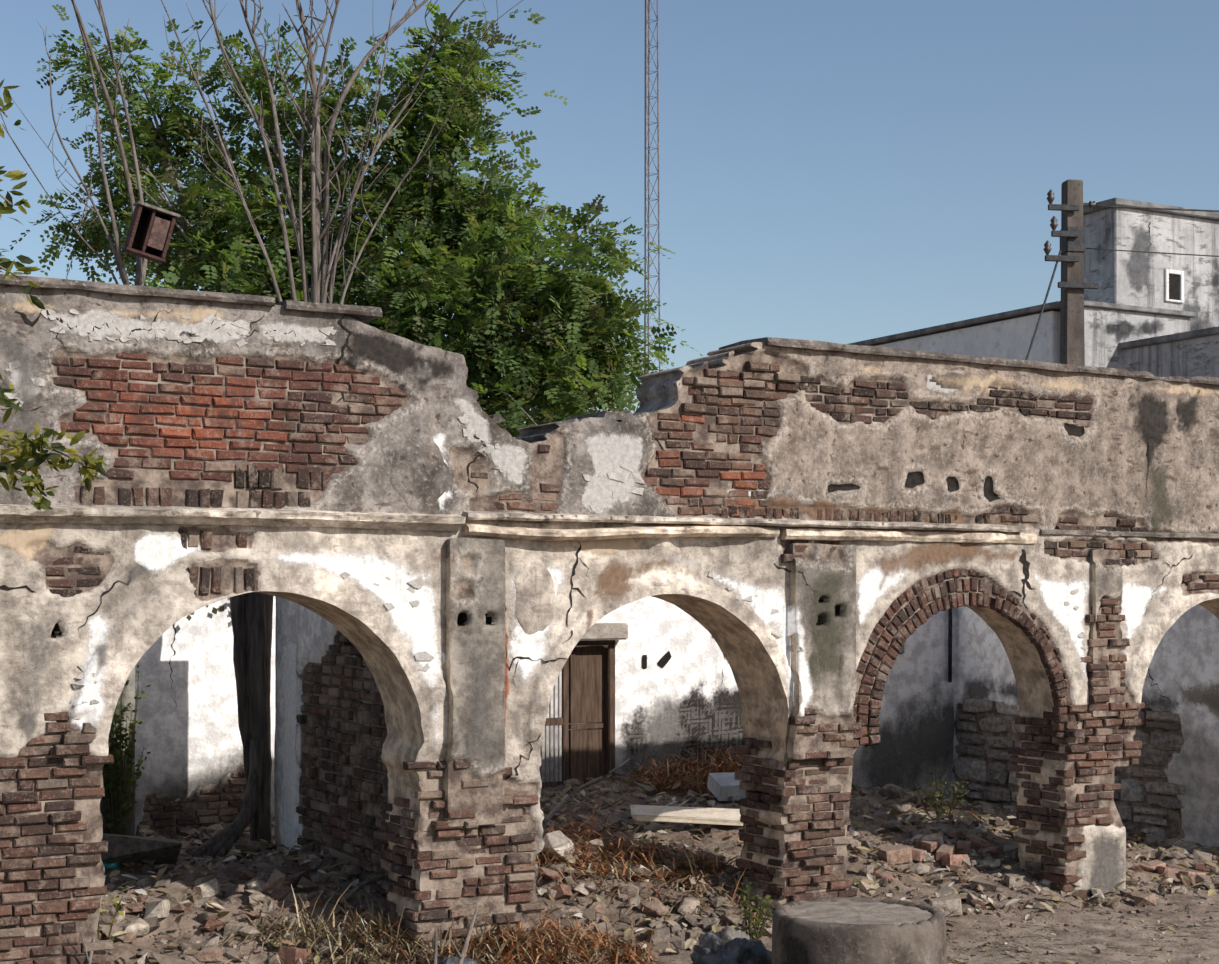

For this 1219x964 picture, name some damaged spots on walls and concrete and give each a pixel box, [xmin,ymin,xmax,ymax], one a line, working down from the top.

leakage [1127,228,1153,291]
spalling [4,302,408,509]
spalling [581,361,1093,525]
leakage [1131,391,1200,531]
crack [79,574,131,628]
peeling [278,551,441,687]
peeling [510,622,551,680]
crack [505,541,592,689]
crack [1013,549,1034,609]
spalling [0,615,114,964]
spalling [282,630,549,962]
spalling [707,566,1187,914]